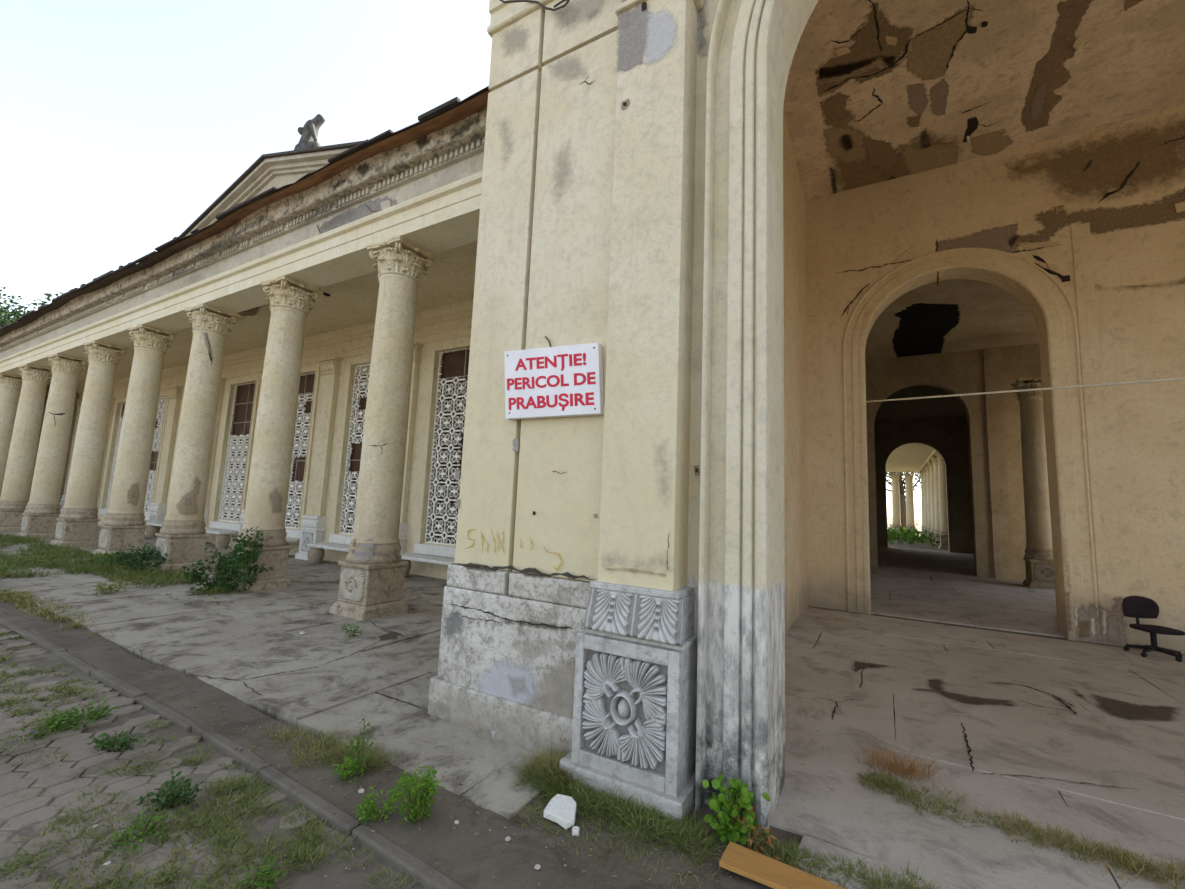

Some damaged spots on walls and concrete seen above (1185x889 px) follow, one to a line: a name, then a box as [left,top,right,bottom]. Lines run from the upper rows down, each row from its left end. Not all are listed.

flaking render [616,2,677,71]
flaking render [819,0,988,127]
flaking render [1021,0,1095,132]
flaking render [820,92,1013,175]
water stain [1012,121,1185,203]
flaking render [935,191,1185,253]
peeling [177,479,200,515]
crack [450,604,581,629]
water stain [854,662,887,671]
water stain [916,679,1013,706]
water stain [1069,688,1178,721]
crack [961,723,1140,790]